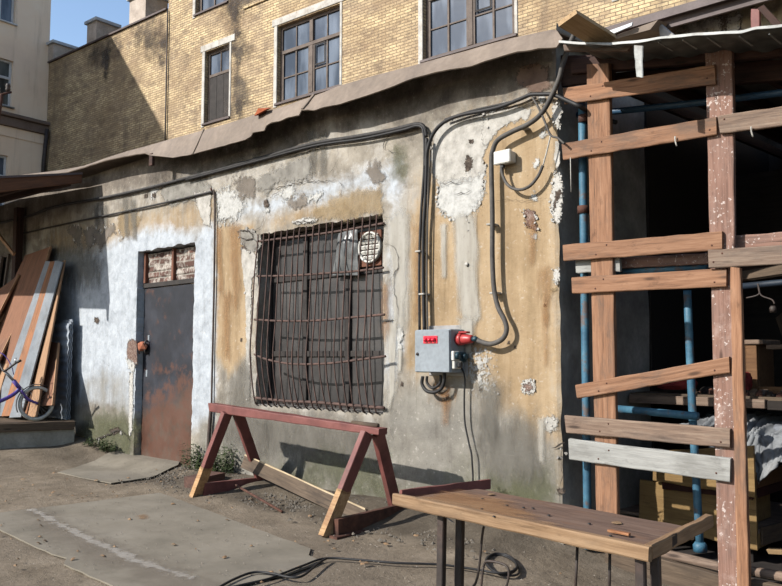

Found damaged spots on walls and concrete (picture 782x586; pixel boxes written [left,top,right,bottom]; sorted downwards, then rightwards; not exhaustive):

flaking render [366,158,386,184]
flaking render [430,102,533,231]
flaking render [499,63,563,240]
flaking render [125,338,148,436]
peeling [462,344,499,398]
flaking render [520,379,536,395]